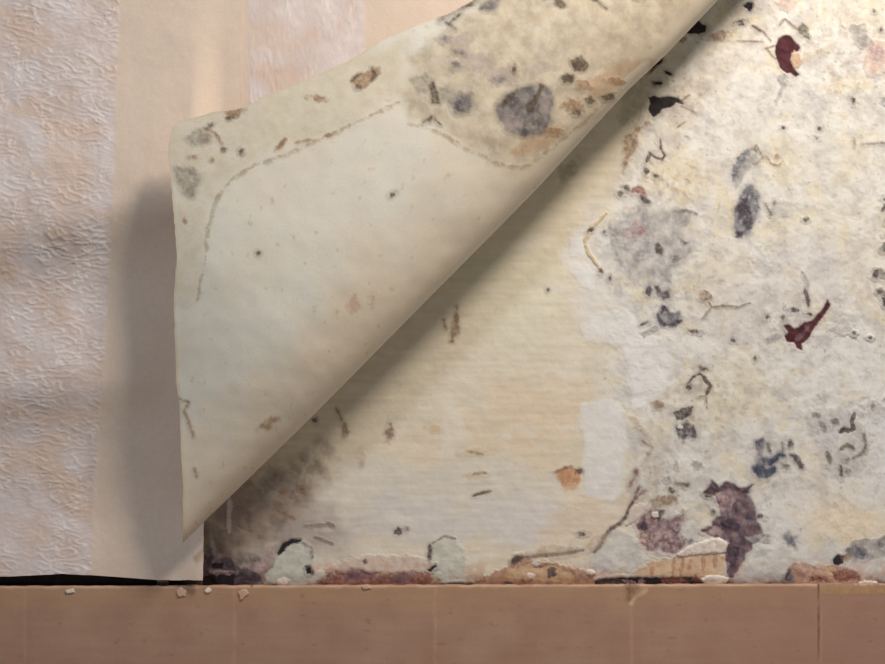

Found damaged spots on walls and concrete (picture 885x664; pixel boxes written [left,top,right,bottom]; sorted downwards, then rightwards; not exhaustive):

spalling [735,30,803,106]
spalling [613,182,654,207]
peeling [582,211,614,286]
spalling [781,297,834,354]
damp [168,413,343,585]
spalling [697,477,878,584]
damp [0,574,157,586]
damp [424,561,440,575]
spalling [264,528,656,607]
damp [609,573,703,584]
damp [780,567,804,584]